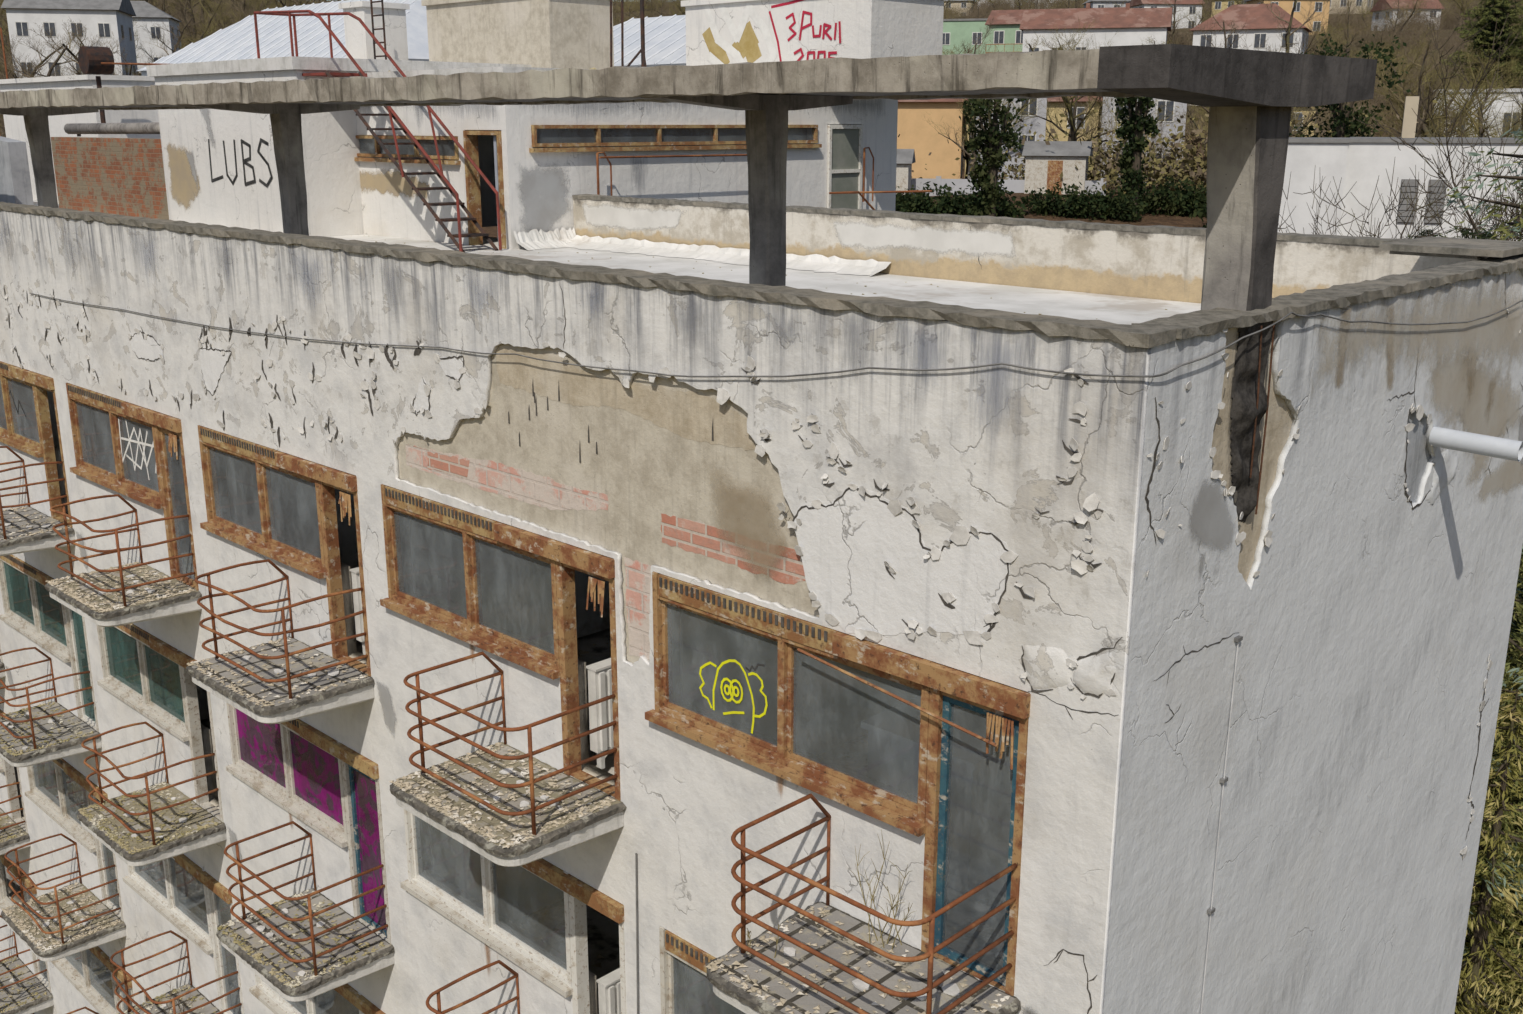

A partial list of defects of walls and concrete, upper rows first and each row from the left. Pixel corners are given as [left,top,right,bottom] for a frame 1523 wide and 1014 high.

peeling [3,284,99,383]
peeling [128,326,164,364]
peeling [144,316,342,447]
peeling [341,334,466,416]
spalling [393,342,1035,663]
peeling [1056,368,1089,485]
peeling [1069,492,1103,575]
peeling [1145,397,1186,542]
spalling [1209,325,1283,546]
spalling [1404,403,1458,509]
crack [1460,654,1493,860]